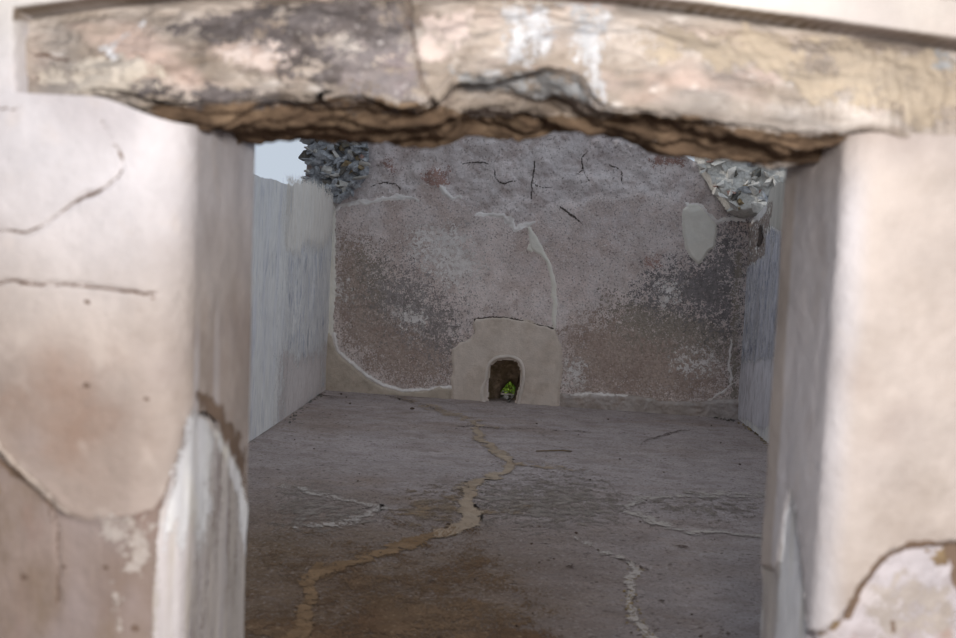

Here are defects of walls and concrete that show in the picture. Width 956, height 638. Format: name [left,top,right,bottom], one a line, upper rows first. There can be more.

leakage [217,38,302,77]
leakage [412,1,616,112]
leakage [634,14,956,134]
crack [3,121,124,234]
crack [0,279,155,299]
crack [474,227,558,331]
crack [463,161,582,224]
spalling [685,202,773,266]
peeling [738,357,774,431]
peeling [0,410,248,638]
crack [277,394,585,638]
spalling [760,489,956,638]